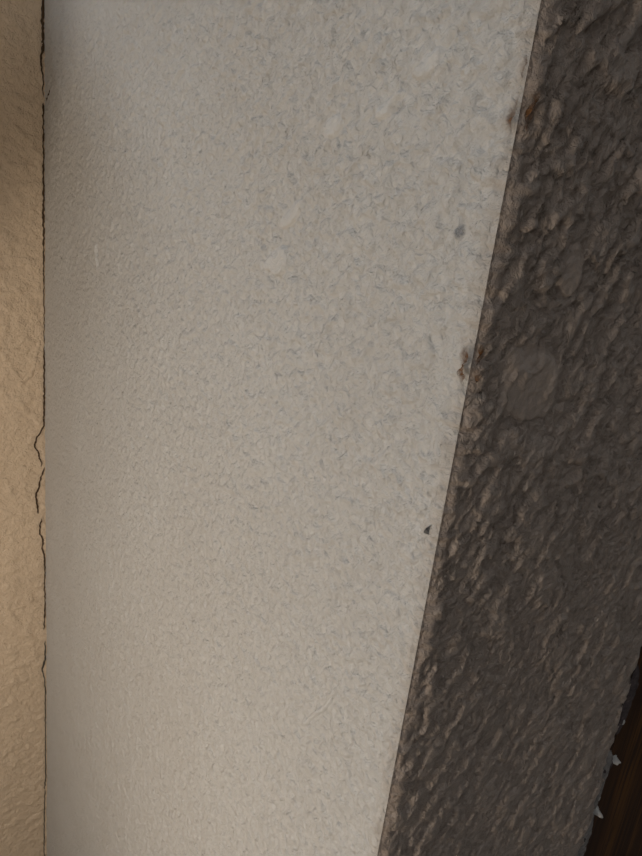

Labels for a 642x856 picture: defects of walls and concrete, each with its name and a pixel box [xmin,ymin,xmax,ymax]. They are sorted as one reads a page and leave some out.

crack [34,0,50,856]
peeling [615,664,640,734]
peeling [577,750,621,856]